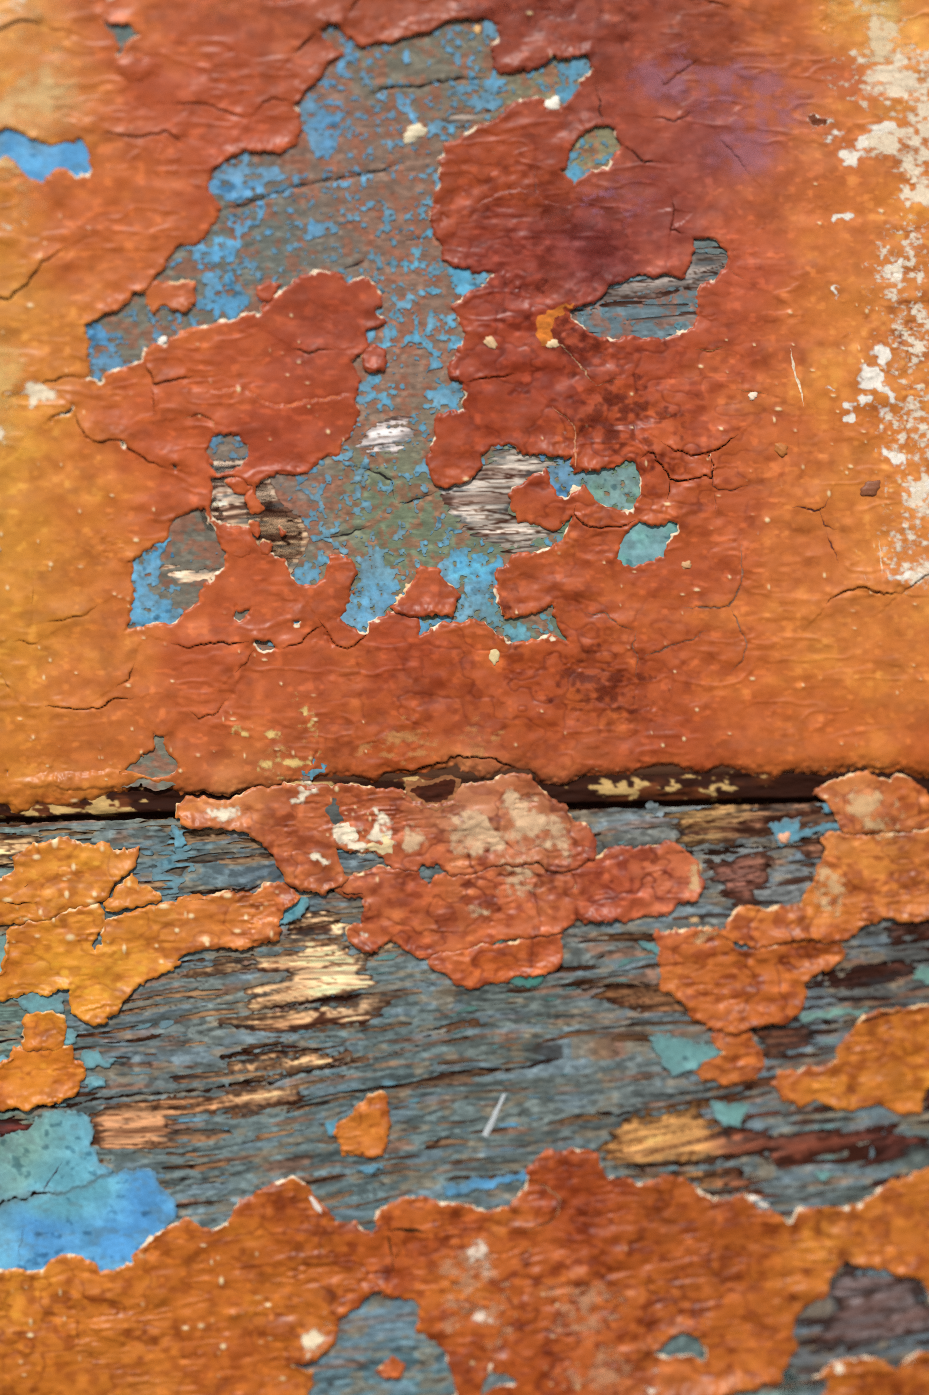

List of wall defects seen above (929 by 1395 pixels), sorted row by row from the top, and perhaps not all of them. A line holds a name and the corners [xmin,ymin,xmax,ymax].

peeling [0,128,91,182]
peeling [84,18,678,644]
peeling [535,238,728,346]
crack [75,416,167,468]
crack [641,435,747,512]
crack [796,498,929,604]
crack [589,545,748,679]
crack [48,665,134,710]
peeling [0,735,929,1272]
peeling [294,1292,456,1395]
peeling [653,1332,705,1362]
peeling [734,1261,929,1395]